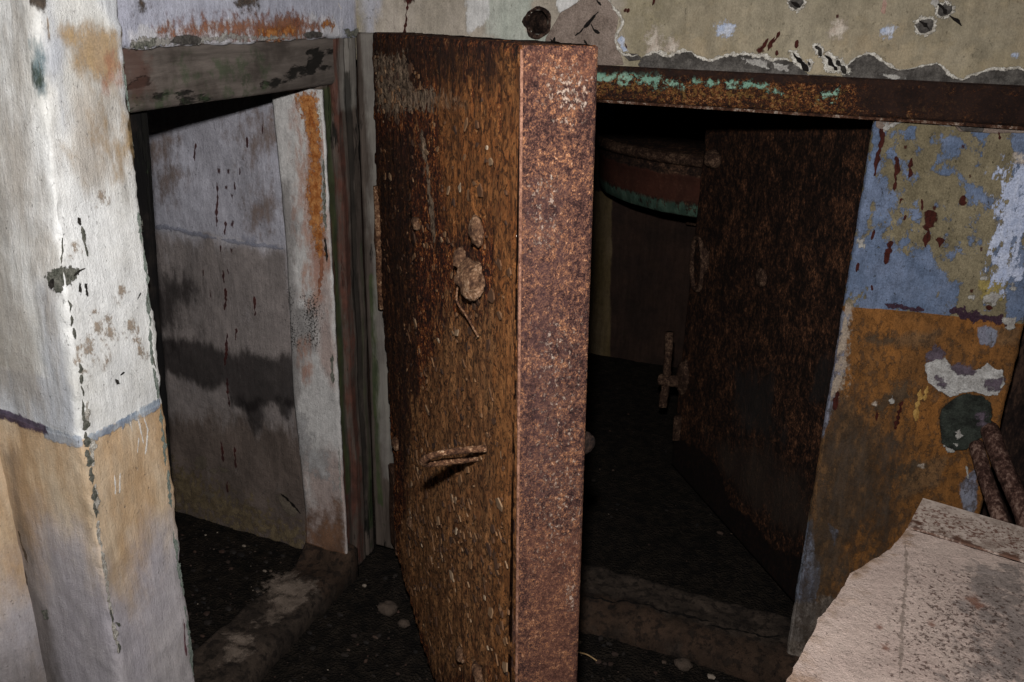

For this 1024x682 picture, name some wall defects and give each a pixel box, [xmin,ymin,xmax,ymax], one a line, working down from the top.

corrosion [158,11,335,42]
spalling [522,0,1024,85]
spalling [876,120,904,132]
leakage [215,168,241,252]
corrosion [295,89,326,296]
corrosion [381,223,454,299]
corrosion [380,140,483,223]
peeling [968,153,1024,307]
leakage [162,287,324,430]
spalling [913,345,1006,421]
spalling [44,266,121,653]
corrosion [400,288,510,682]